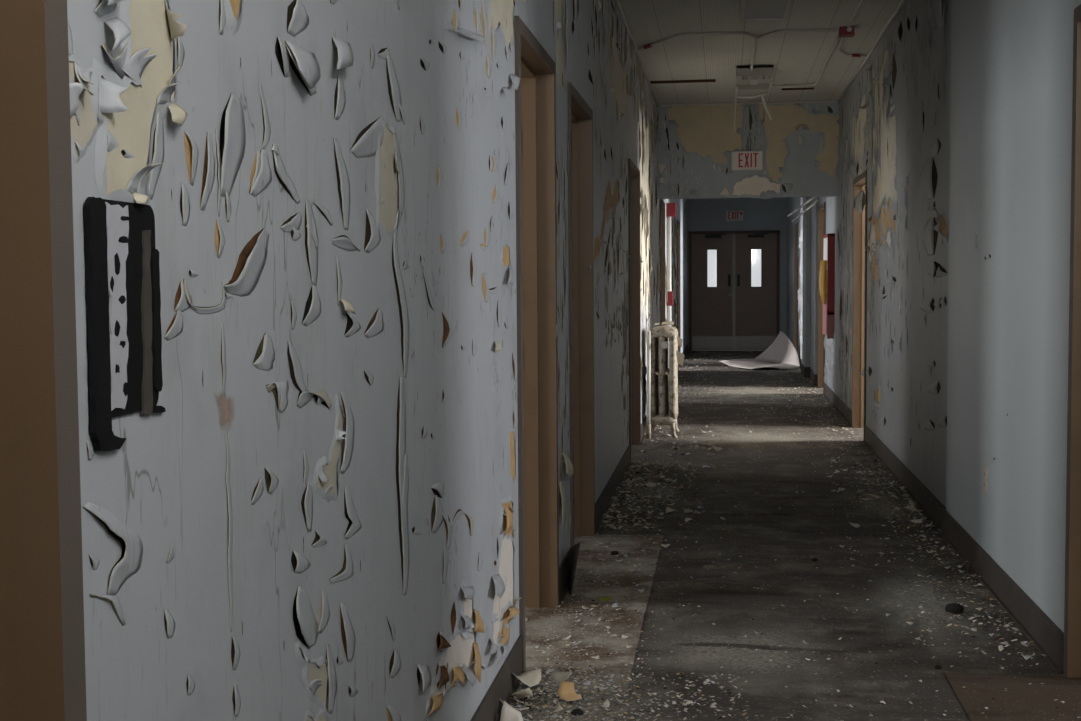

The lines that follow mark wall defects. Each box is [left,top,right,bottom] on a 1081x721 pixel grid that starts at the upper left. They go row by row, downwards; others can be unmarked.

peeling [84,502,143,626]
peeling [164,609,176,638]
peeling [69,0,321,327]
peeling [231,622,243,670]
peeling [253,332,362,721]
peeling [331,48,473,595]
peeling [417,428,522,719]
peeling [460,228,514,303]
peeling [475,0,517,63]
peeling [509,73,520,90]
peeling [557,291,574,533]
peeling [588,0,679,449]